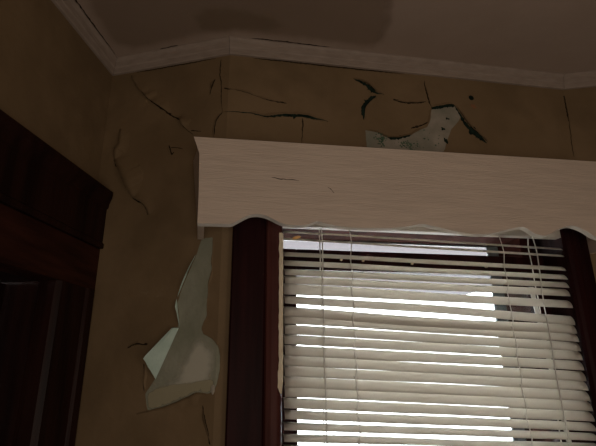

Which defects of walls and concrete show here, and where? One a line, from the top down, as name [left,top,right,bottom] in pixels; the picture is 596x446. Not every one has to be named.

crack [137,58,328,140]
peeling [365,102,488,152]
peeling [136,237,223,419]